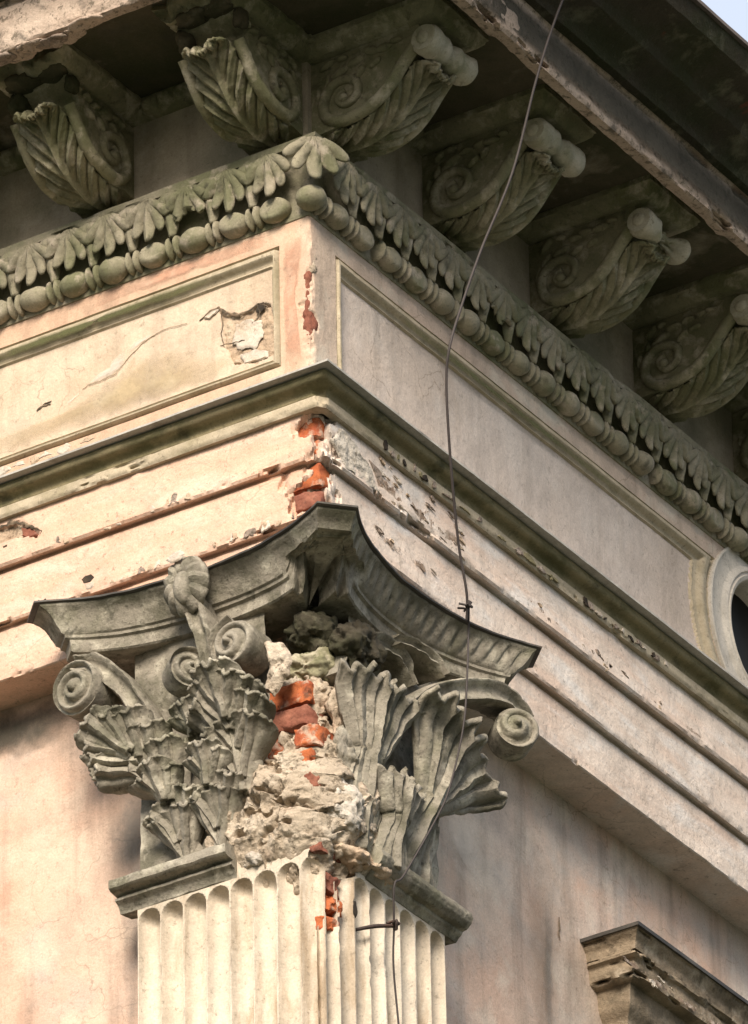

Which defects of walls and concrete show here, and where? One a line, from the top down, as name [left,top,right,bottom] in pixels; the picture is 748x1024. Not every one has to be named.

spalling [72,248,318,400]
spalling [0,520,42,548]
spalling [229,414,483,561]
spalling [498,535,559,584]
spalling [205,610,394,931]